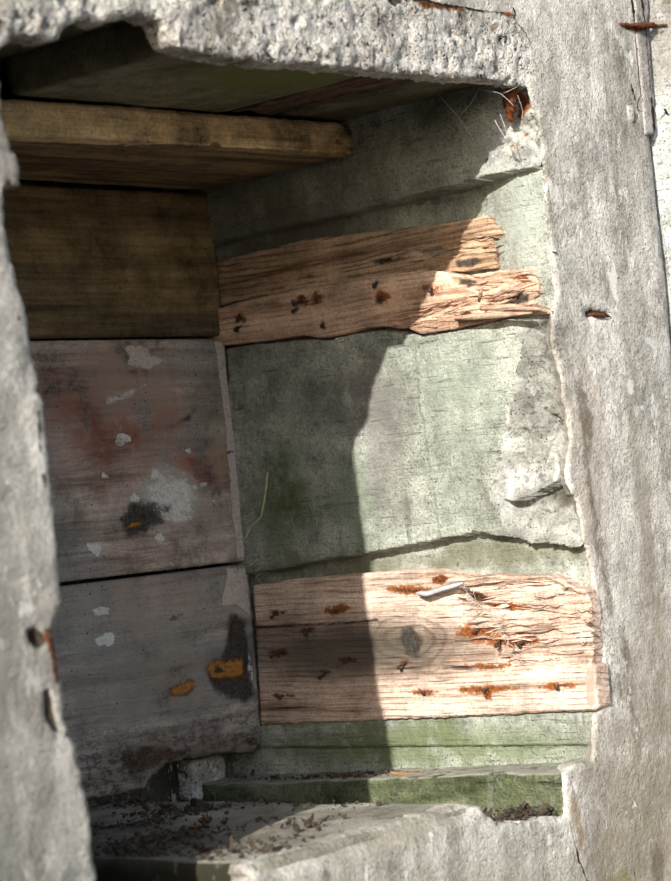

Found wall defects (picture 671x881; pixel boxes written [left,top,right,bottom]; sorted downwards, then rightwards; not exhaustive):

spalling [0,0,542,171]
corrosion [418,1,465,11]
corrosion [518,93,531,120]
crack [631,0,669,131]
spalling [489,314,583,547]
corrosion [43,628,59,684]